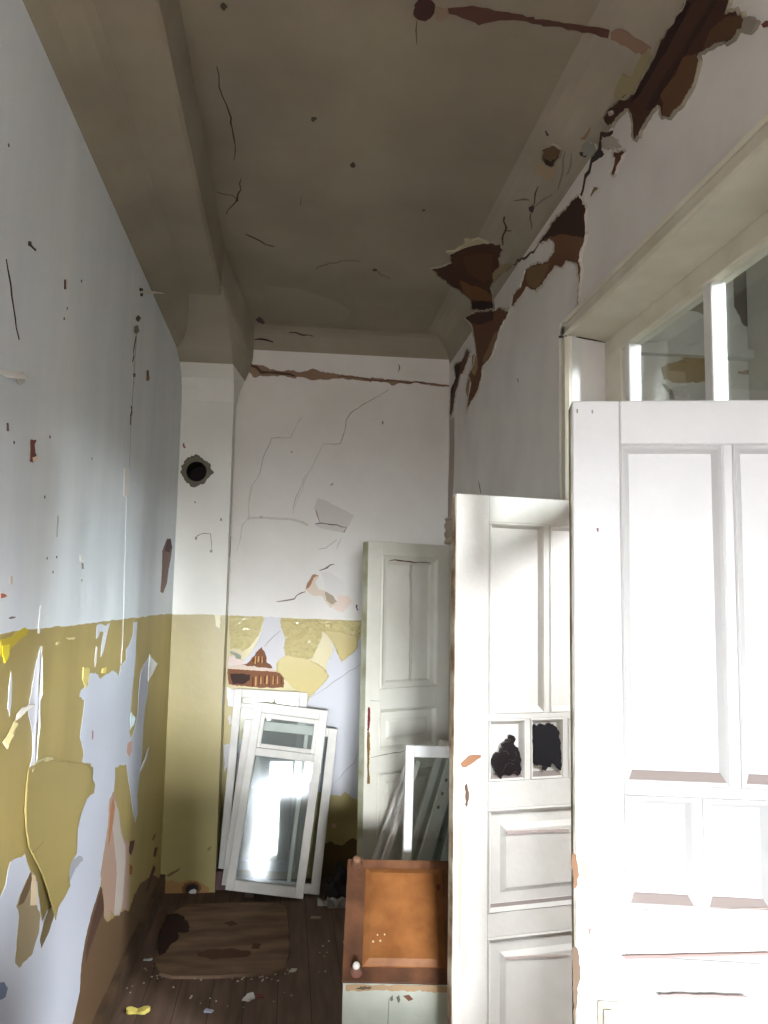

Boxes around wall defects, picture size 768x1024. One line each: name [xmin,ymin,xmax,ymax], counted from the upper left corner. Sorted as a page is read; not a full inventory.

hole [413,0,435,21]
crack [217,68,242,214]
crack [501,128,613,265]
flaking render [448,0,768,178]
crack [6,259,20,340]
flaking render [430,193,589,420]
crack [197,417,302,550]
crack [249,332,449,571]
flaking render [160,539,172,593]
peeling [227,616,285,725]
peeling [250,636,361,799]
peeling [0,622,158,1024]